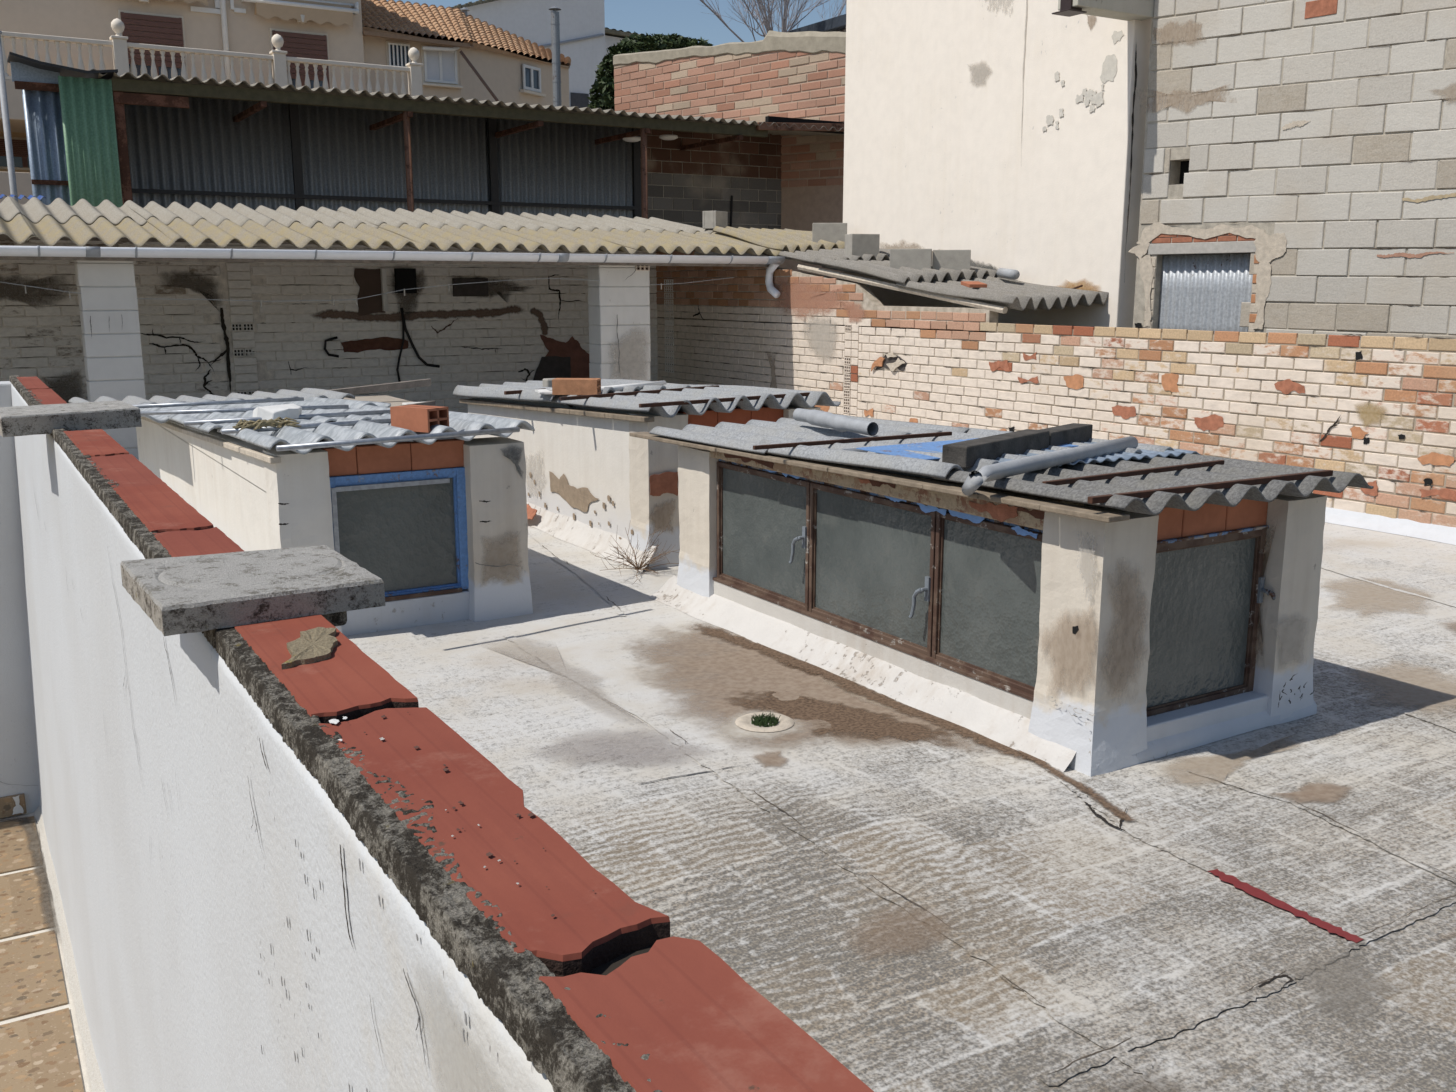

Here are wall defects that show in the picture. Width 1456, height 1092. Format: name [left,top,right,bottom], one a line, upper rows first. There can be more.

crack [90,308,231,395]
spalling [533,335,590,381]
damp [502,447,522,476]
spalling [527,471,634,540]
damp [1042,571,1146,692]
damp [635,627,1135,821]
crack [1085,802,1128,833]